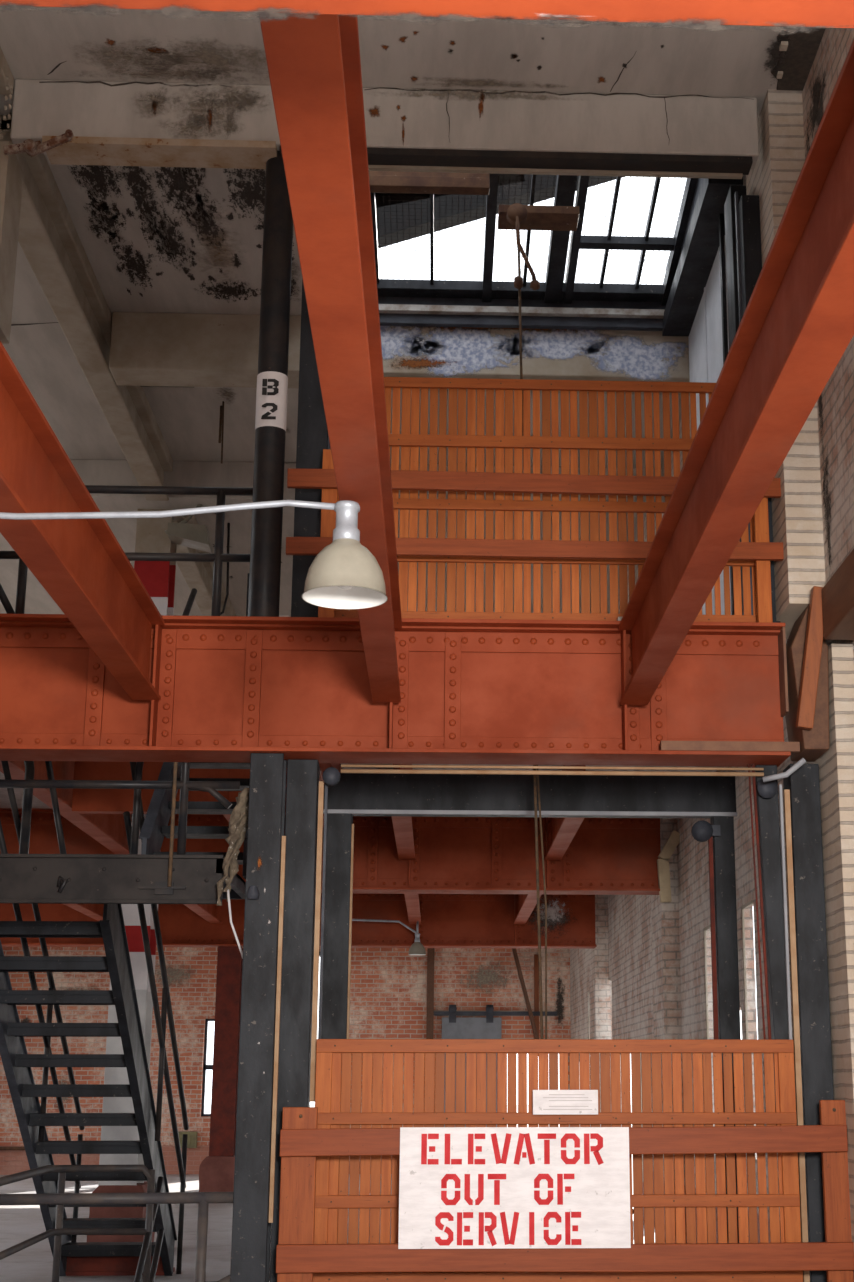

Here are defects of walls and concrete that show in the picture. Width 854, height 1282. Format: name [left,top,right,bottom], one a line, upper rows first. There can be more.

damp [92,42,266,137]
crack [364,52,750,141]
peeling [380,326,689,379]